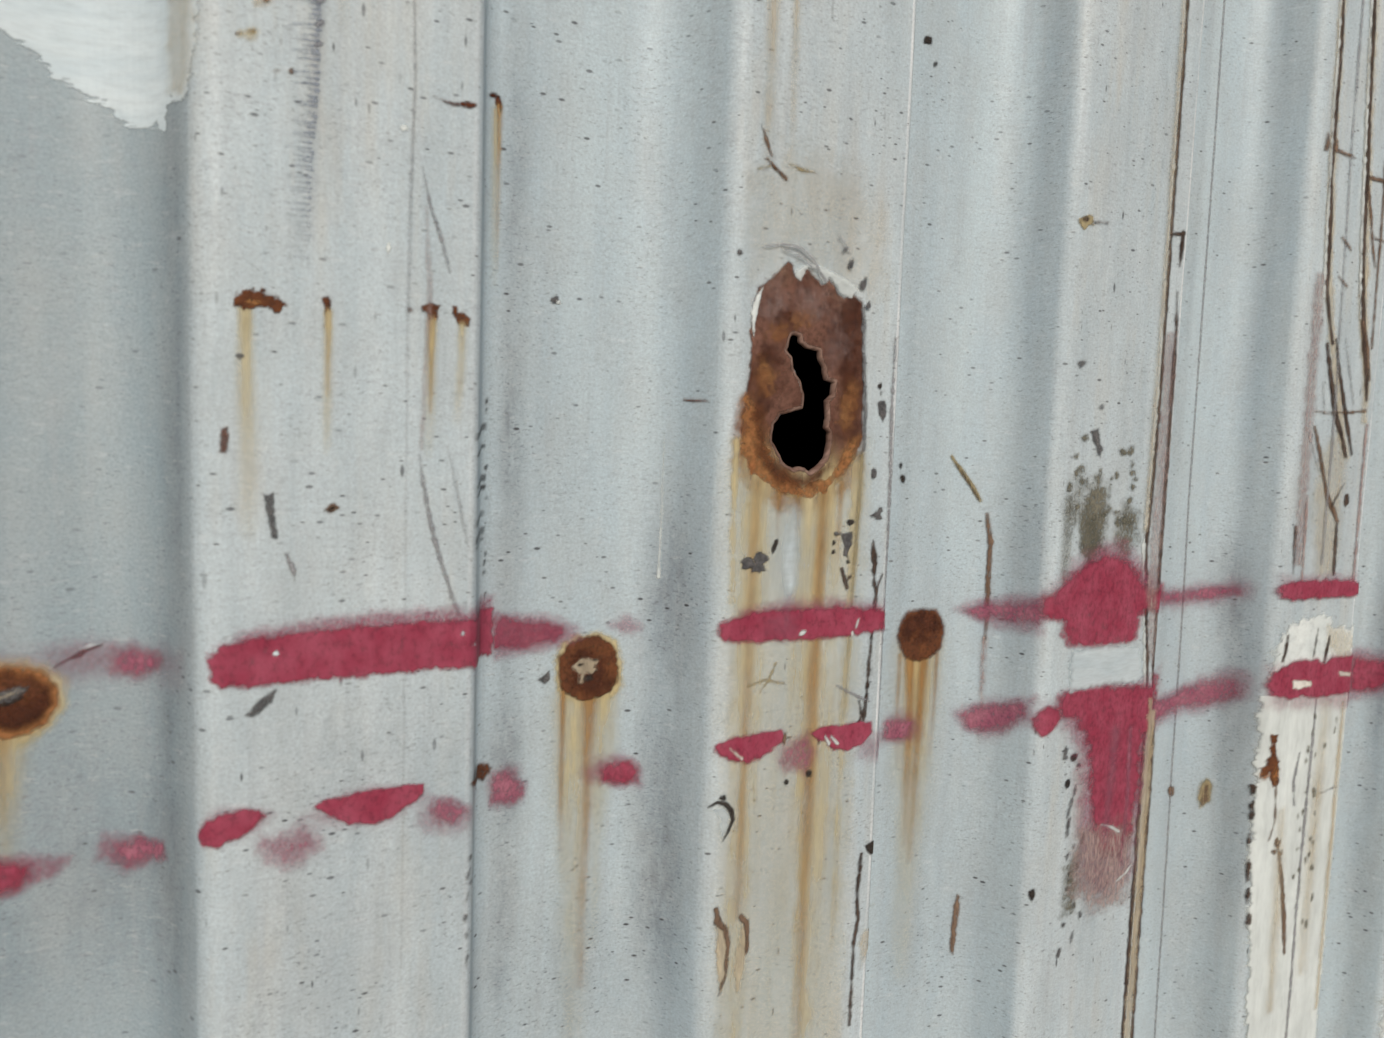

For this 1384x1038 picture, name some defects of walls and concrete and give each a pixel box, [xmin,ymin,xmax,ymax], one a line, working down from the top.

peeling [0,0,199,132]
rust [233,288,286,403]
rust [322,296,331,339]
rust [409,303,470,357]
rust [220,427,229,452]
rust [0,662,64,789]
rust [556,632,622,783]
rust [897,609,944,756]
peeling [1245,613,1354,1038]